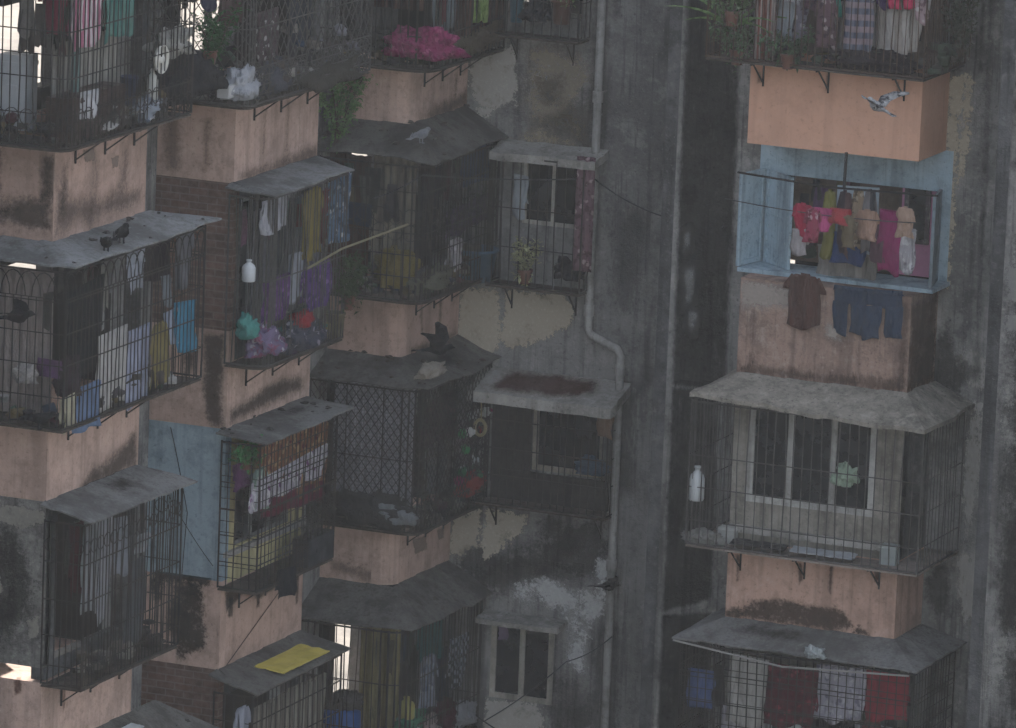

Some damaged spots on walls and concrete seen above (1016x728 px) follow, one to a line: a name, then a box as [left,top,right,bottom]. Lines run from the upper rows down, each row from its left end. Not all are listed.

flaking render [467,44,518,118]
water stain [741,282,789,307]
rust [494,372,596,396]
water stain [658,0,738,728]
water stain [741,292,986,393]
water stain [962,400,983,536]
water stain [0,527,32,642]
mould [154,571,211,658]
water stain [726,599,870,639]
water stain [928,552,975,624]